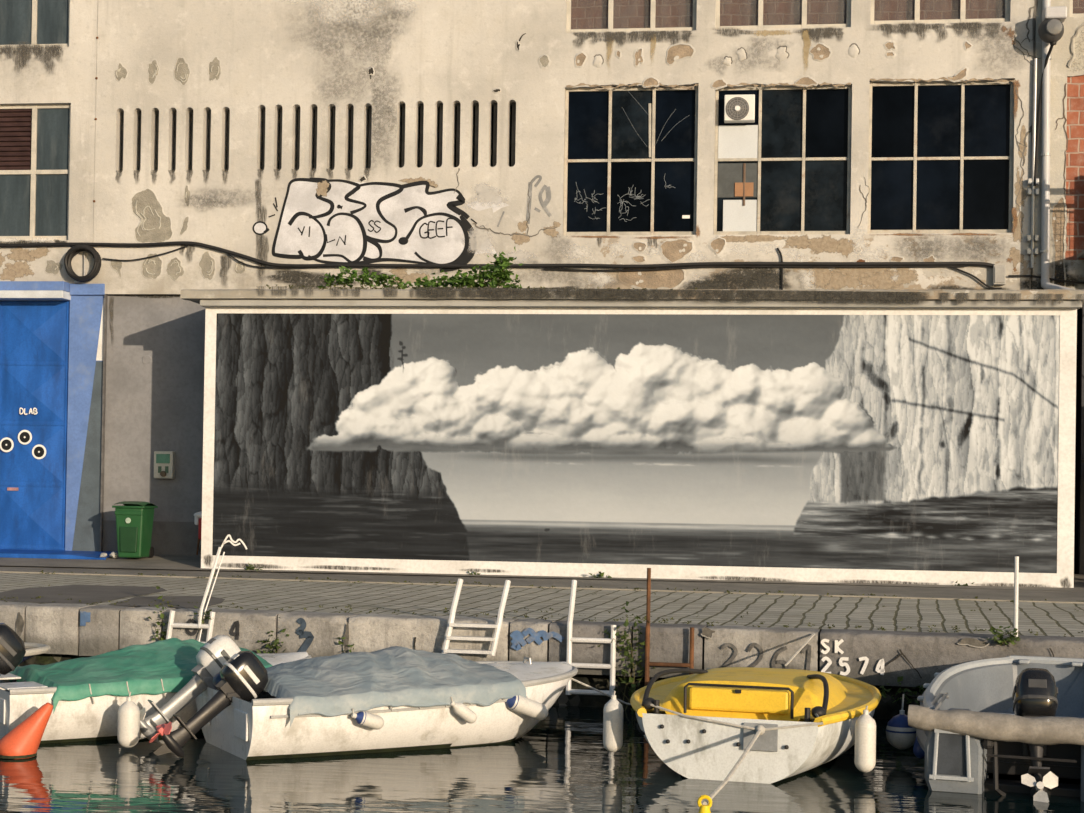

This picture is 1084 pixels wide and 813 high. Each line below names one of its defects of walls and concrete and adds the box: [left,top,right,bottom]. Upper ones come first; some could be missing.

leakage [0,45,61,69]
spalling [665,42,696,66]
spalling [566,48,851,90]
spalling [809,42,832,62]
leakage [881,23,1000,39]
crack [1014,0,1068,290]
crack [473,179,557,237]
peeling [0,238,51,281]
peeling [593,230,936,290]